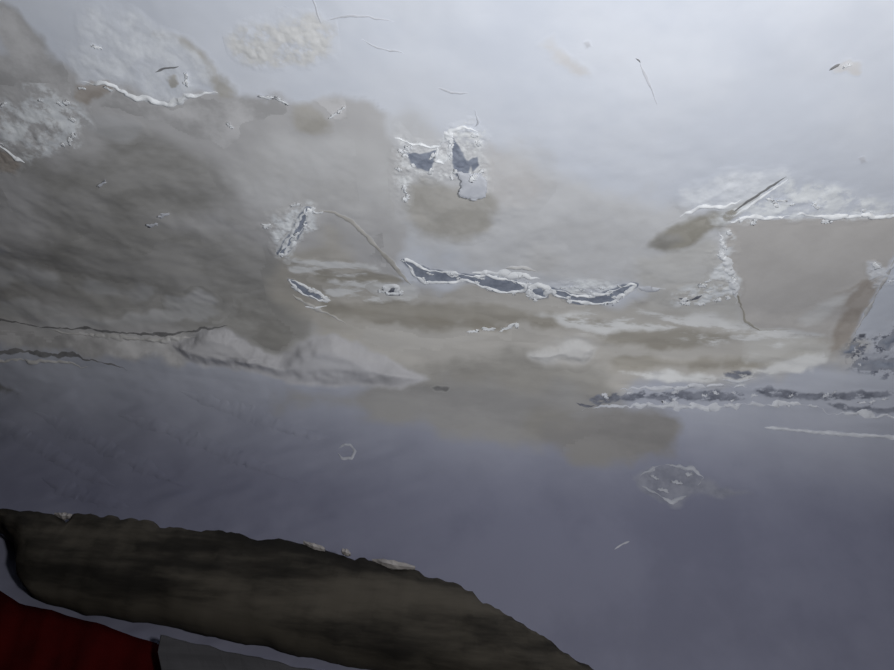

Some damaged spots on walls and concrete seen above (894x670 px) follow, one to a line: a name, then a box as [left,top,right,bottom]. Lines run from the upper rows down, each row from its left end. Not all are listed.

water stain [0,0,71,95]
peeling [0,0,220,177]
peeling [386,110,495,210]
crack [0,318,227,371]
flaking render [259,199,323,265]
flaking render [286,278,347,324]
water stain [0,26,857,477]
flaking render [365,258,639,307]
peeling [662,162,894,313]
peeling [833,320,894,381]